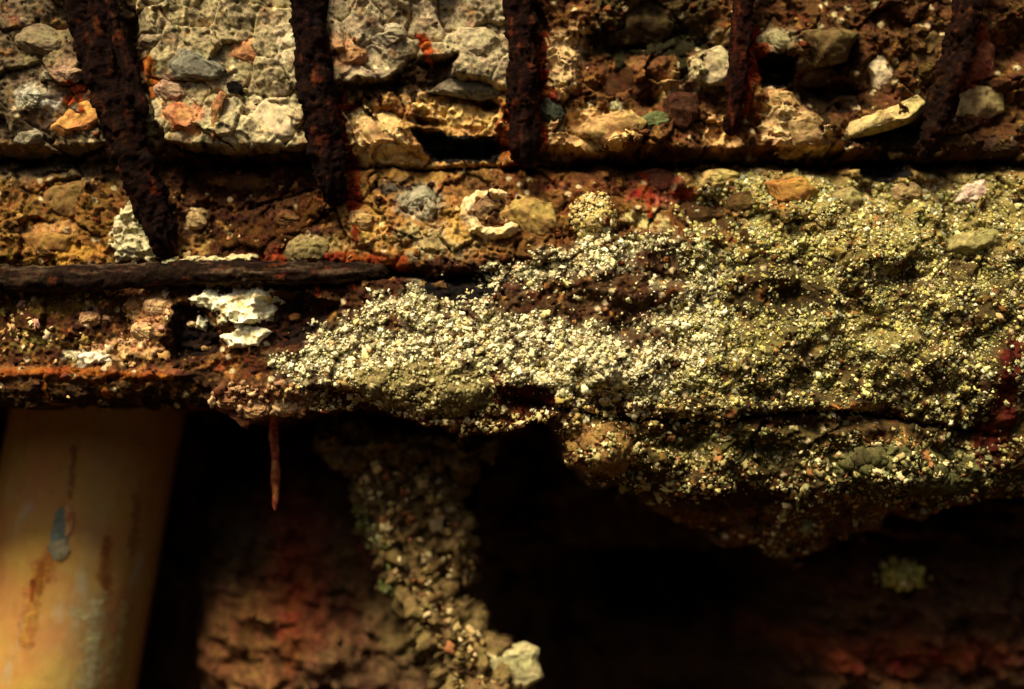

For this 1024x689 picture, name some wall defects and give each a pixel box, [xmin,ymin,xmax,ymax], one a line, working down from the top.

rust [61,80,88,114]
rust [142,54,160,98]
rust [535,30,558,150]
spalling [408,127,514,168]
rust [495,101,517,171]
damp [108,201,259,264]
spalling [460,188,520,241]
spalling [424,270,495,302]
spalling [170,304,219,357]
damp [188,284,285,349]
spalling [273,290,337,347]
rust [0,366,174,399]